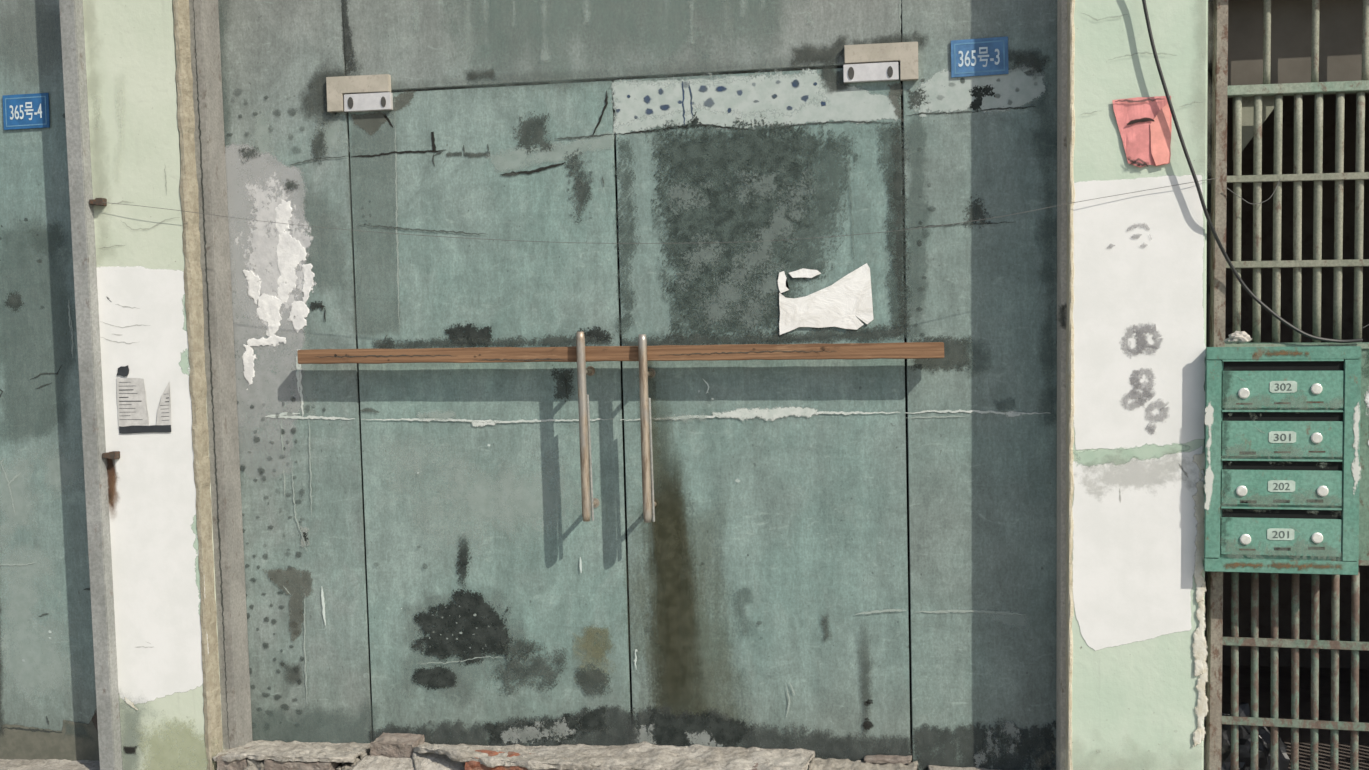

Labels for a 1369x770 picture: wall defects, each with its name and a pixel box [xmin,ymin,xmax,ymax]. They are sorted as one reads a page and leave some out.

crack [291,91,1036,176]
peeling [821,67,848,92]
peeling [888,83,904,122]
peeling [242,199,317,390]
spalling [1065,0,1214,770]
corrosion [106,458,117,506]
peeling [1352,391,1369,494]
water stain [456,541,472,591]
water stain [646,361,735,721]
water stain [485,706,608,744]